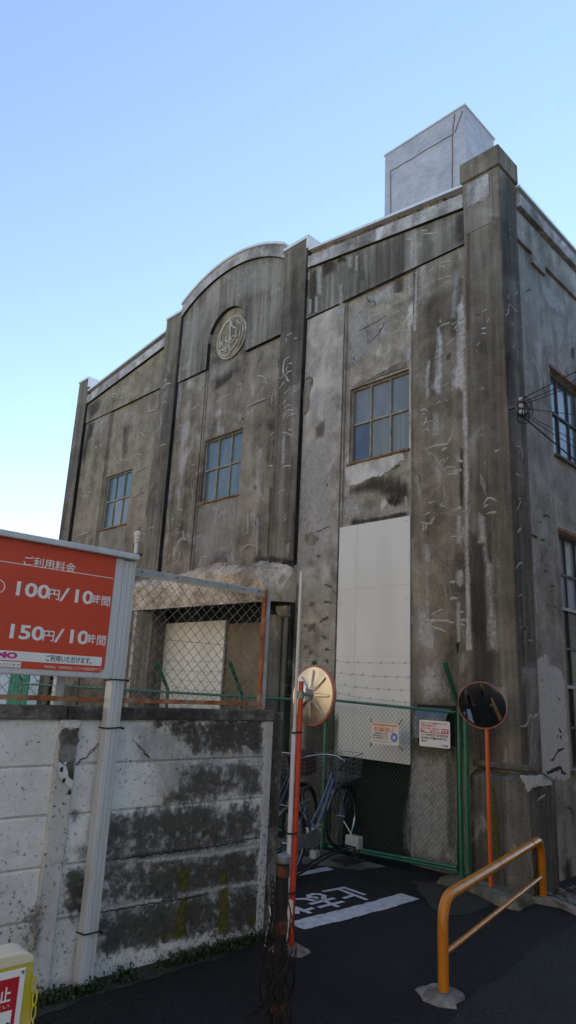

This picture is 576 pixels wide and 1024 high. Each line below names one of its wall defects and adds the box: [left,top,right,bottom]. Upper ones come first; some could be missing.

water stain [345,478,407,524]
spalling [57,721,82,789]
peeling [520,654,570,792]
water stain [99,707,281,957]